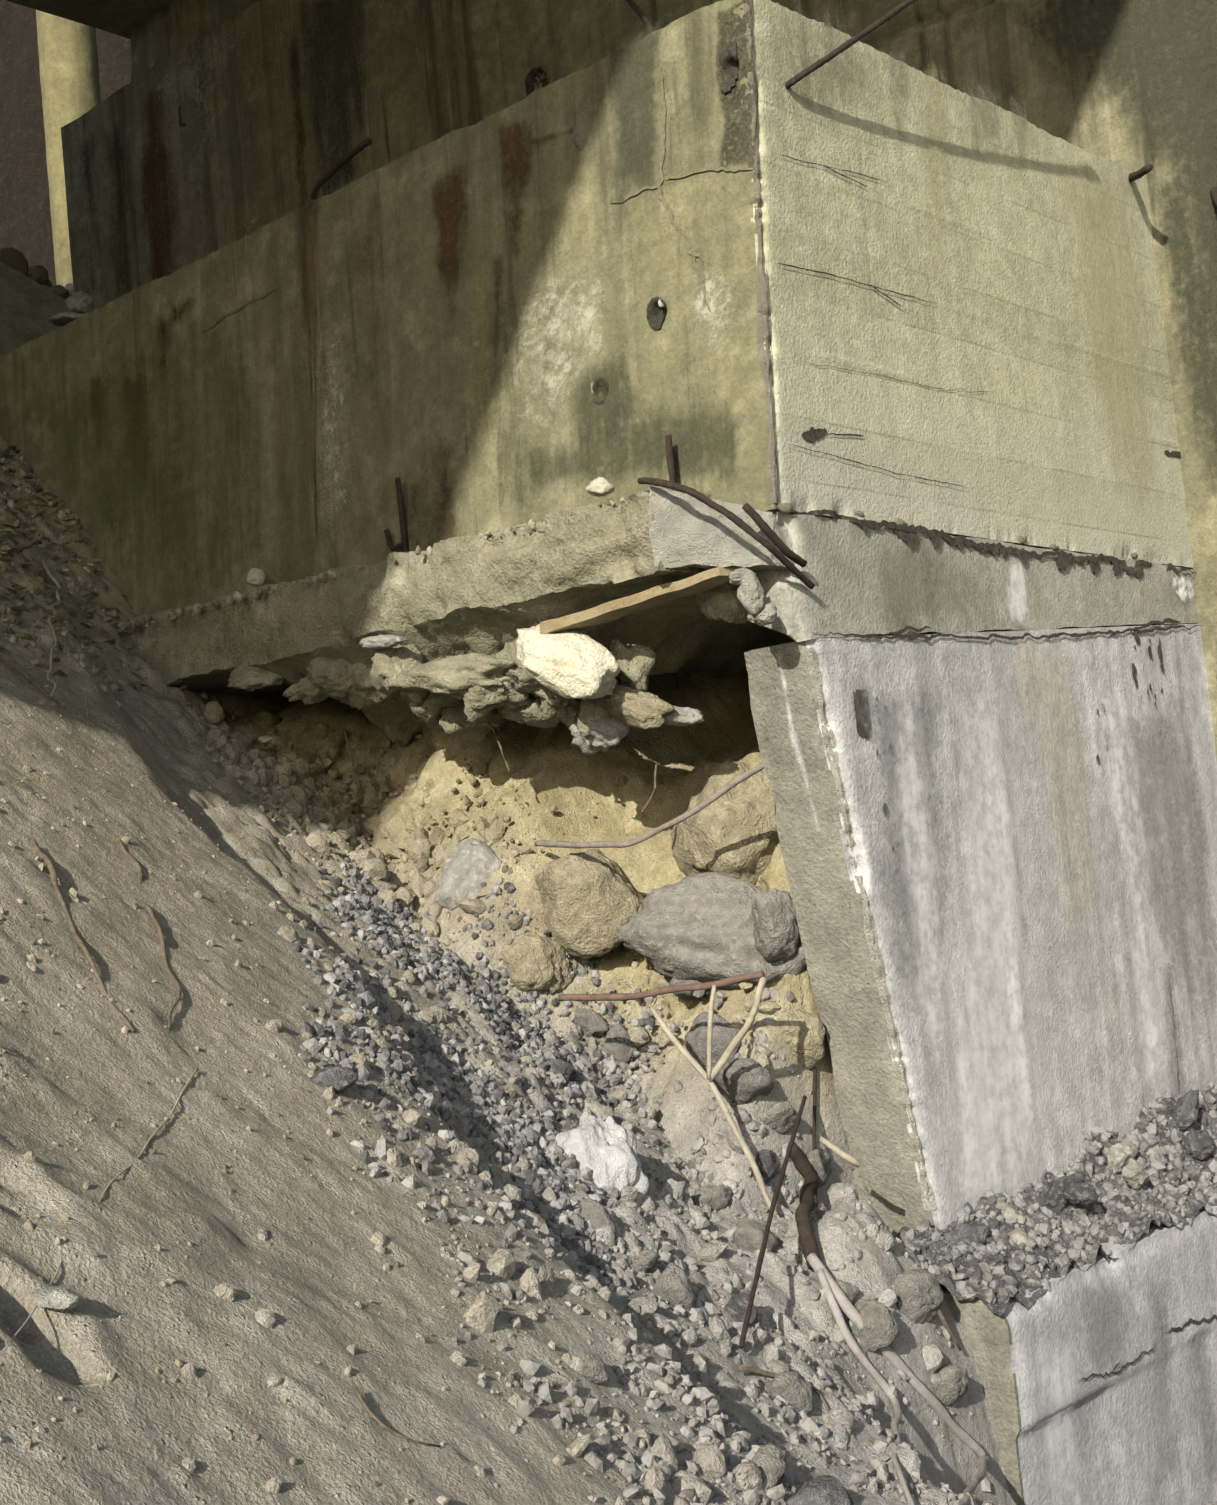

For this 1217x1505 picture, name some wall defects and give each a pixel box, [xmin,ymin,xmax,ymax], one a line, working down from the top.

leakage [302,0,365,196]
rust [82,82,173,295]
crack [611,70,884,313]
rust [433,173,463,294]
leakage [1024,0,1217,474]
crack [790,444,967,488]
crack [1164,449,1181,457]
crack [777,503,1196,578]
crack [811,618,1203,641]
leakage [1009,565,1026,621]
crack [1080,1312,1217,1381]